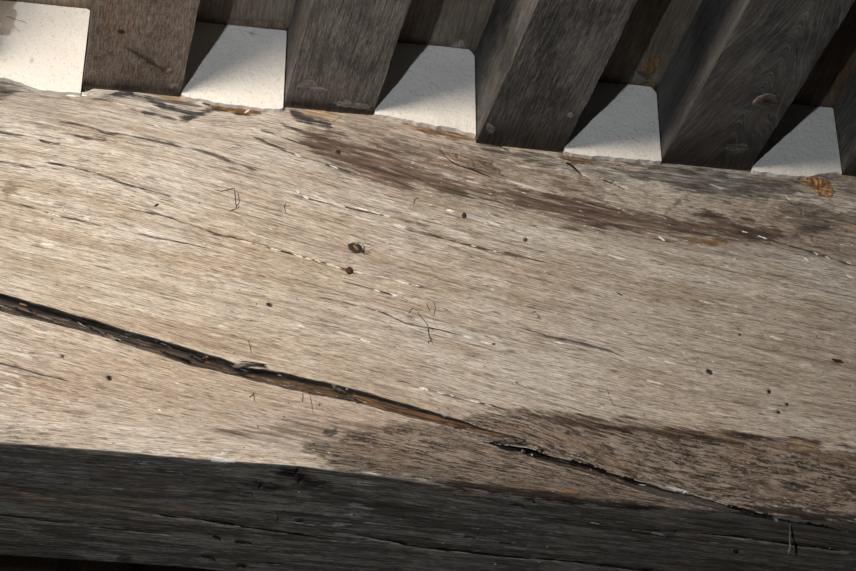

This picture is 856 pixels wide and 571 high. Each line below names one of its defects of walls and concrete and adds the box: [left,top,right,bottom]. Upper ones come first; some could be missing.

damp [300,109,803,246]
damp [216,417,385,442]
crack [0,294,856,551]
damp [535,410,822,444]
damp [412,476,664,511]
damp [740,504,856,524]